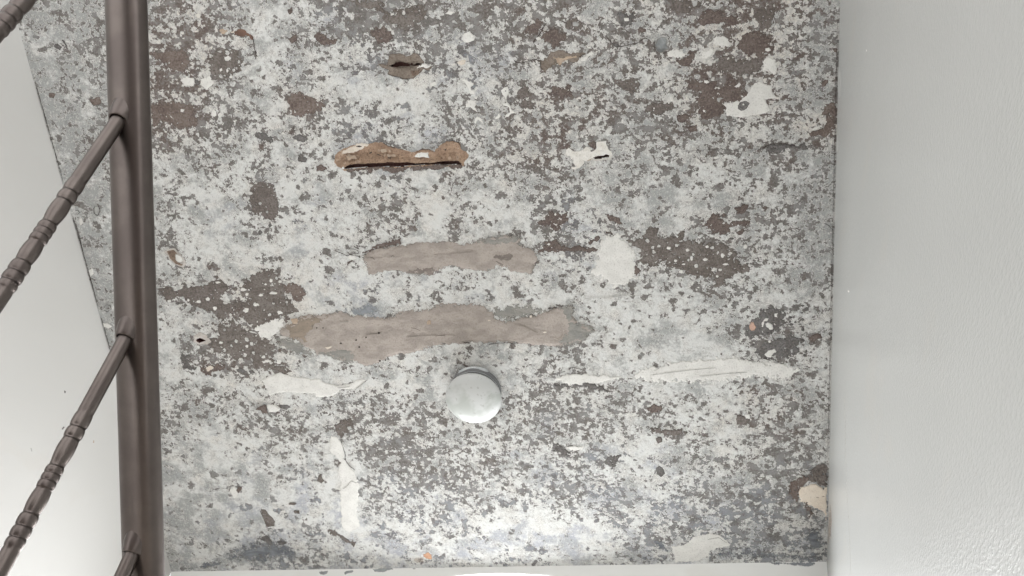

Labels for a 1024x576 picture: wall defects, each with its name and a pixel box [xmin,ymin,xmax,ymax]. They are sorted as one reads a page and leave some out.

peeling [347,0,437,87]
peeling [253,132,273,151]
spalling [285,91,469,174]
spalling [788,461,828,520]